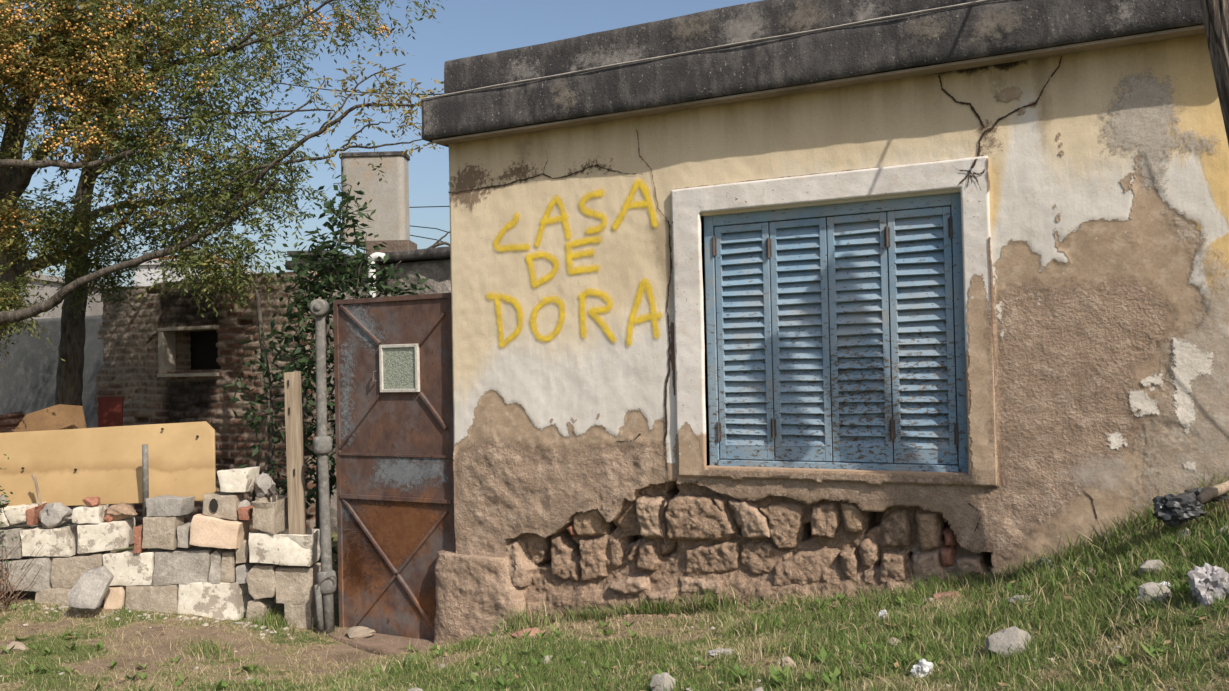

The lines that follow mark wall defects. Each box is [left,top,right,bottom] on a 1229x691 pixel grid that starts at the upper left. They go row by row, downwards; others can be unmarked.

water stain [672,13,761,43]
water stain [850,3,882,21]
water stain [975,9,1020,40]
water stain [552,46,645,107]
crack [934,56,1062,192]
crack [448,129,880,548]
peeling [373,154,1229,624]
crack [988,237,1003,487]
corrosion [344,500,442,595]
corrosion [410,585,436,620]